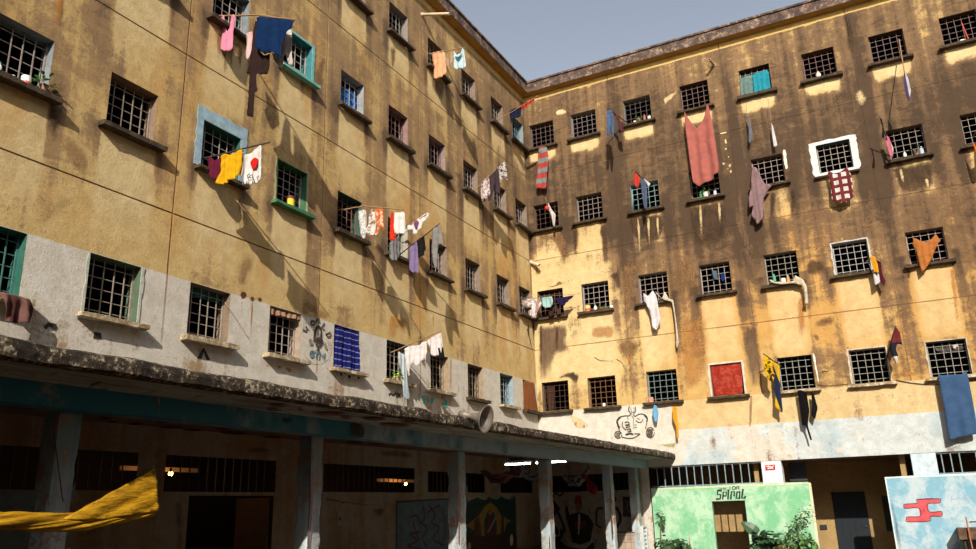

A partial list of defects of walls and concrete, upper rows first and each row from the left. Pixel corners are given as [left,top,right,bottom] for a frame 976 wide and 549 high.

water stain [893,162,933,190]
water stain [545,228,577,256]
water stain [631,215,663,247]
water stain [744,327,761,380]